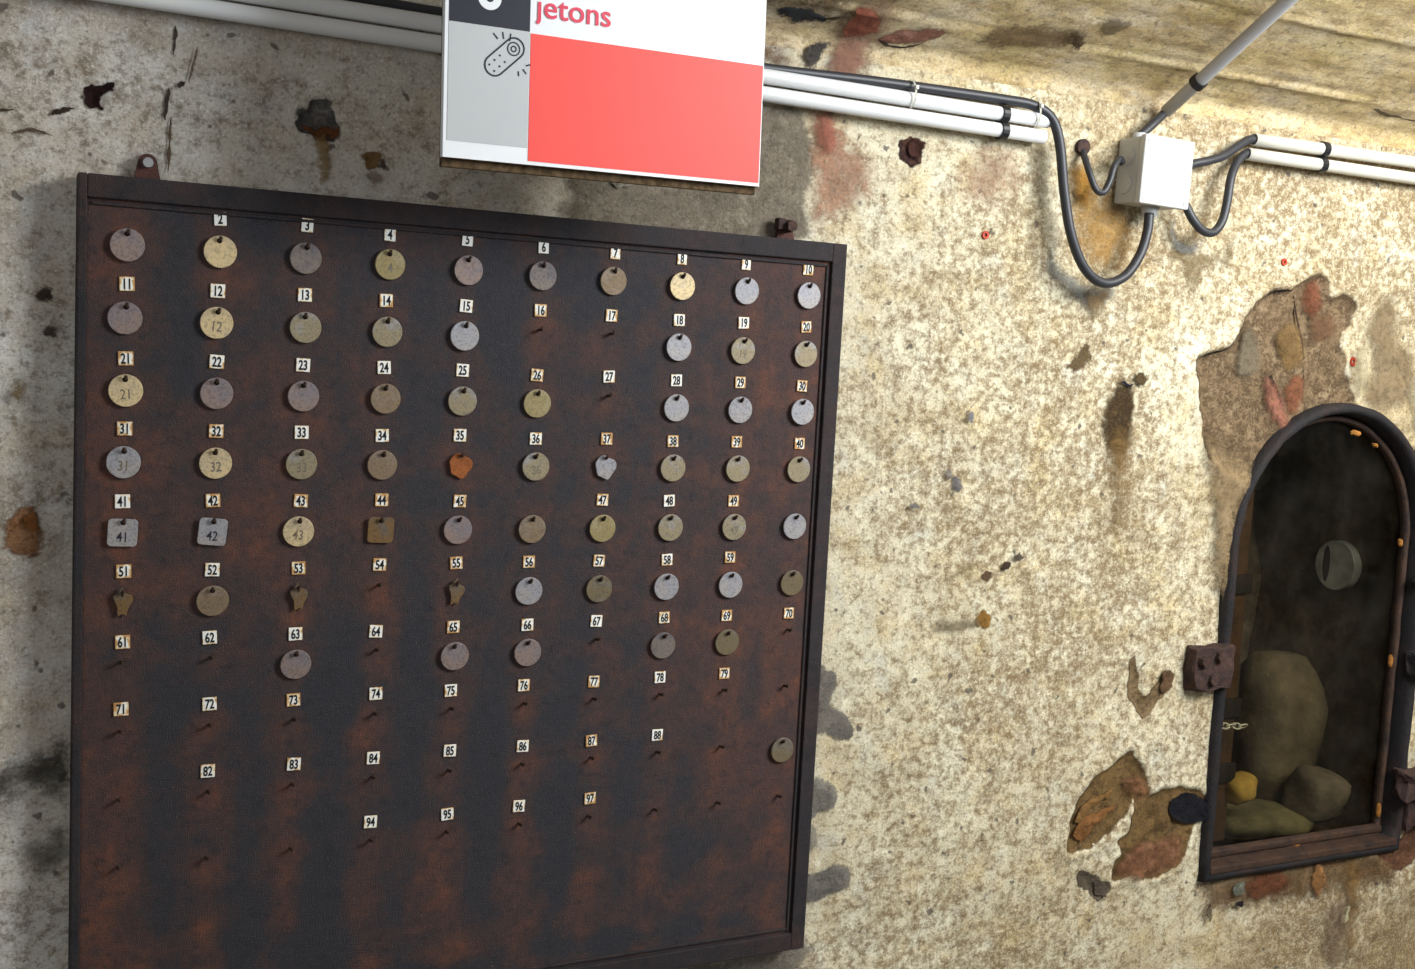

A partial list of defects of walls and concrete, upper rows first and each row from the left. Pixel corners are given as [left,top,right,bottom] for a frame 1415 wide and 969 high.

leakage [766,0,849,22]
leakage [805,41,831,69]
peeling [843,7,946,48]
flaking render [1196,273,1412,590]
flaking render [1128,656,1175,718]
flaking render [1068,751,1211,901]